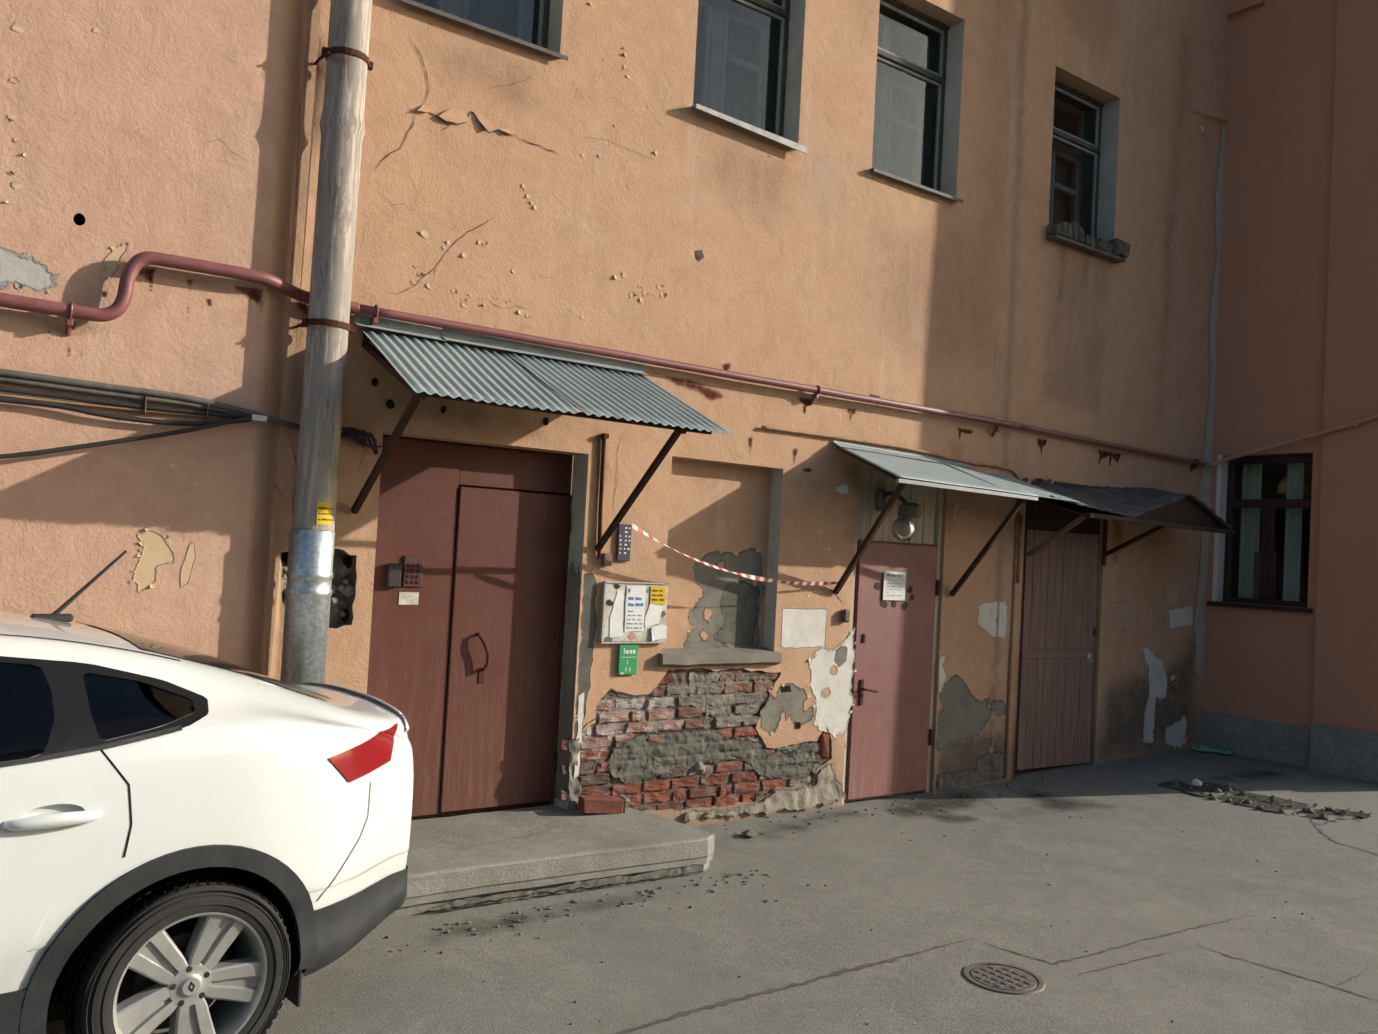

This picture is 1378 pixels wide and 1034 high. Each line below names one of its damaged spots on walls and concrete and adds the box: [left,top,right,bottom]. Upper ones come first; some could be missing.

crack [375,36,556,213]
peeling [0,245,60,293]
crack [387,217,495,294]
rust [672,377,722,399]
rust [1098,449,1121,465]
peeling [129,528,196,592]
spalling [555,547,857,822]
peeling [935,655,1007,751]
water stain [1107,655,1192,746]
peeling [1142,646,1188,749]